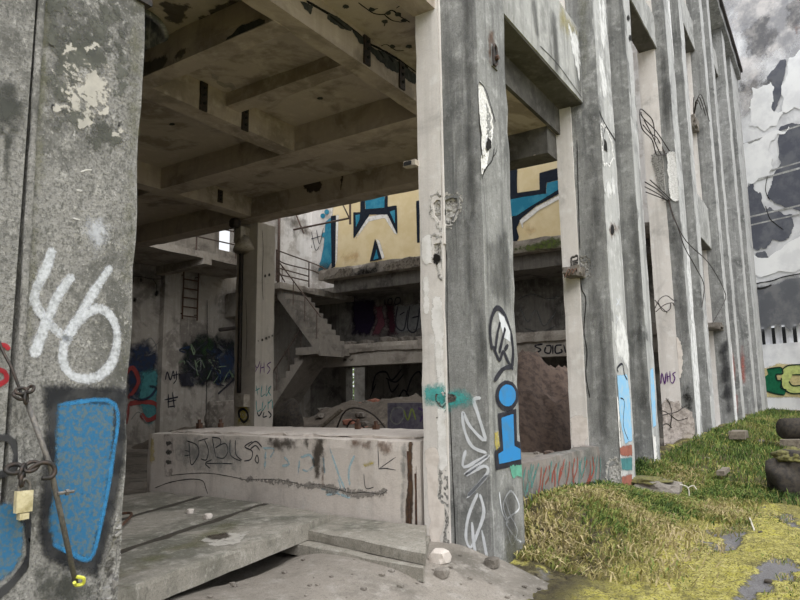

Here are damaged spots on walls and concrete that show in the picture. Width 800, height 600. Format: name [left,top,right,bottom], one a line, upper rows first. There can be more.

peeling [52,42,111,129]
peeling [327,13,416,84]
leakage [0,84,23,178]
spalling [324,268,353,280]
spalling [383,191,463,281]
spalling [639,109,726,324]
leakage [269,438,295,449]
leakage [305,439,323,477]
corrosion [405,442,417,524]
peeling [423,276,456,543]
spalling [653,399,695,461]